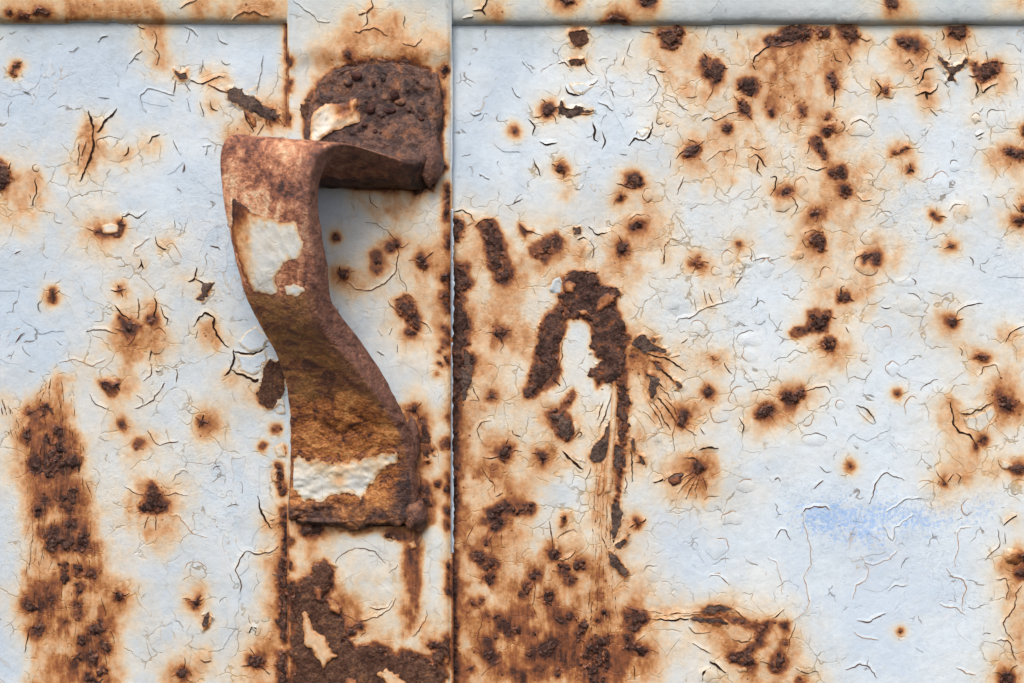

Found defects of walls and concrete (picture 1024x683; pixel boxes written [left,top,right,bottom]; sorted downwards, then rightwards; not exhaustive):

crack [0,82,191,254]
crack [565,30,805,203]
rust [667,72,801,135]
rust [821,0,1024,375]
crack [932,31,973,87]
crack [0,324,115,475]
crack [111,220,256,381]
rust [698,157,1024,516]
rust [287,400,450,683]
rust [453,616,489,683]
rust [625,604,657,632]
crack [647,572,750,683]